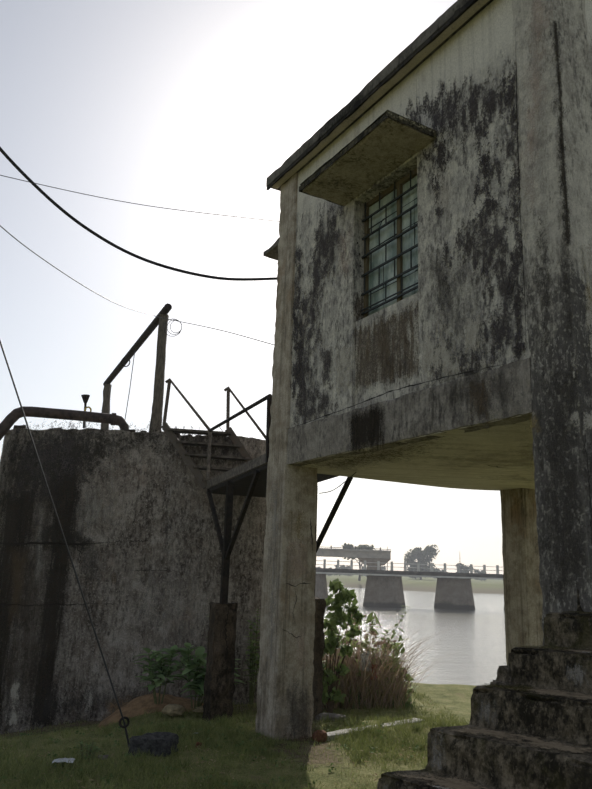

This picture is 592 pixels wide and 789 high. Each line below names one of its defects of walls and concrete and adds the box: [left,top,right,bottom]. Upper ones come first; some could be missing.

water stain [432,138,446,218]
water stain [475,140,494,215]
water stain [503,71,526,358]
water stain [550,21,573,299]
water stain [291,246,303,398]
water stain [320,345,332,389]
water stain [355,302,509,413]
water stain [303,401,438,470]
water stain [0,421,137,731]